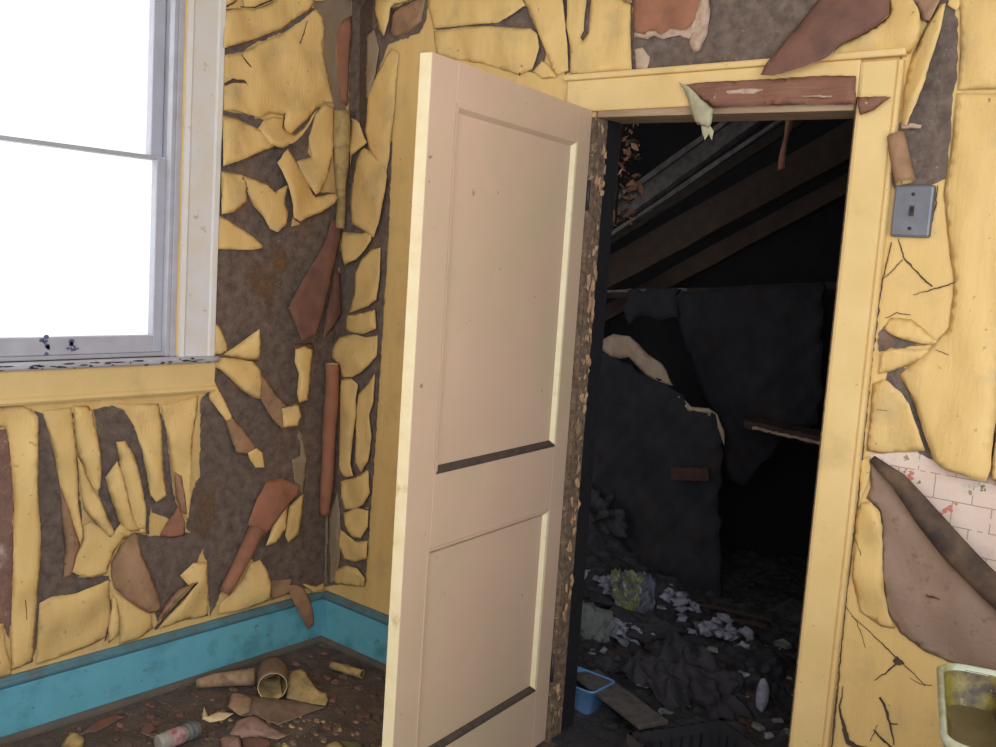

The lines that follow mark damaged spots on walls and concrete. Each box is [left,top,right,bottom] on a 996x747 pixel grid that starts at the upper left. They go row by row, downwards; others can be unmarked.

peeling [0,0,428,678]
peeling [562,574,574,622]
peeling [566,455,581,560]
peeling [429,0,996,481]
crack [831,242,930,747]
peeling [852,456,996,670]